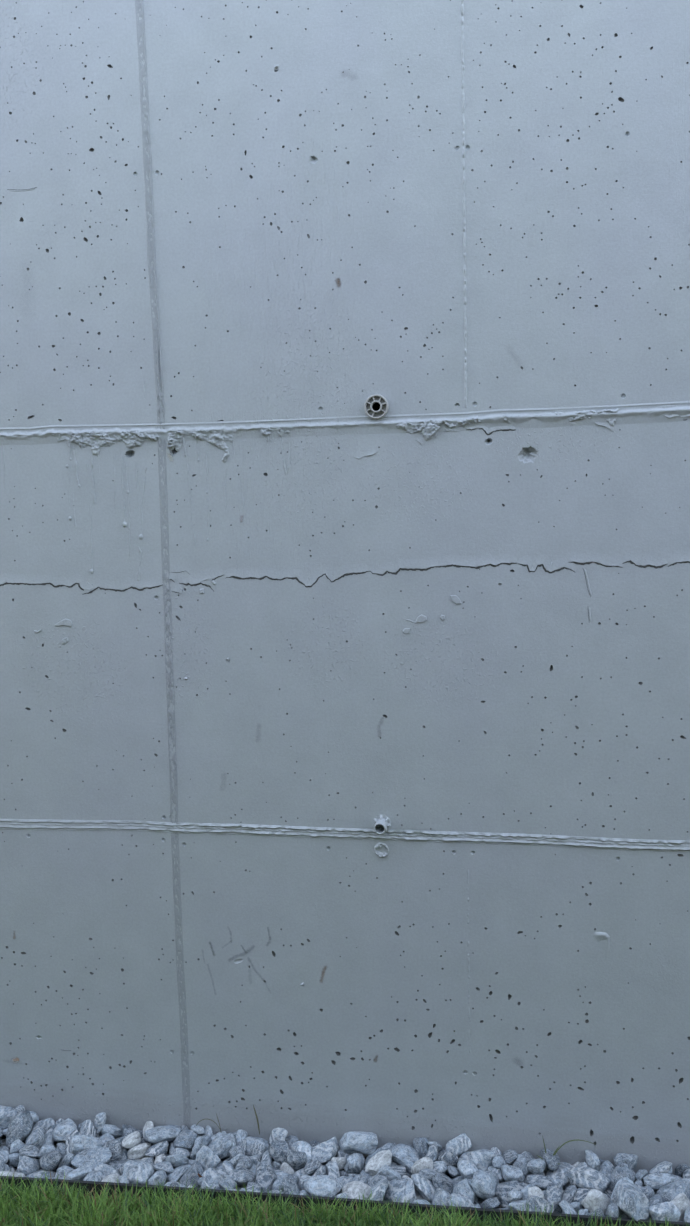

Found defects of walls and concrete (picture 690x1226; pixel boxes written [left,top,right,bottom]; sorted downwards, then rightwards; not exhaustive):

spalling [390,406,620,447]
spalling [517,446,539,464]
crack [0,545,690,622]